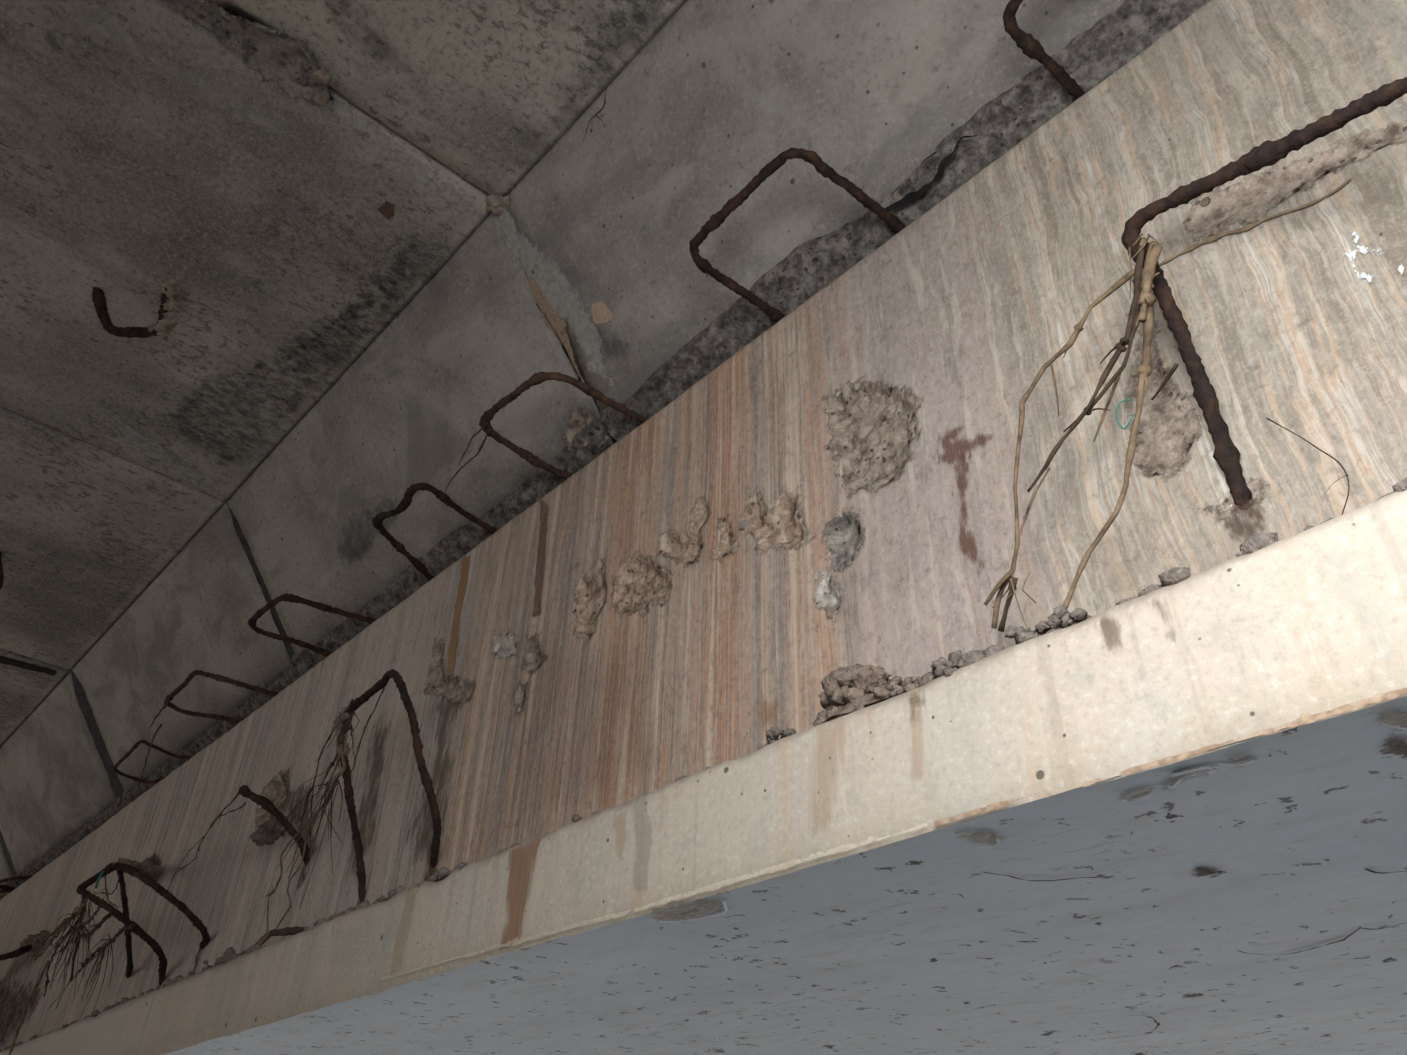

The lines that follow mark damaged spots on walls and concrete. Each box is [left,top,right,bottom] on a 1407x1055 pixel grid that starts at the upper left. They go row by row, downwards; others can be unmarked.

peeling [527,277,581,378]
spalling [562,407,610,449]
spalling [739,377,924,621]
rust [938,428,990,564]
spalling [572,496,711,649]
spalling [343,638,476,868]
spalling [239,770,309,865]
spalling [340,753,366,902]
spalling [0,945,32,961]
spalling [76,862,210,985]
rust [500,838,540,949]